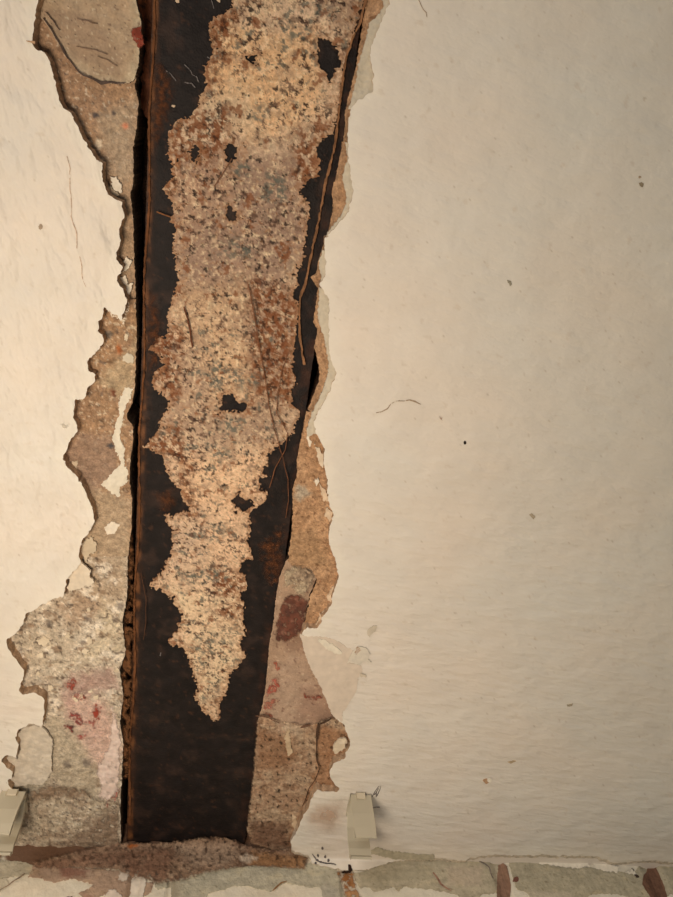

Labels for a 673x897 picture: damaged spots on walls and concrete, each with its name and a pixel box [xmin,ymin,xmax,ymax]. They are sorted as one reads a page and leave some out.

crack [26,11,126,85]
crack [67,157,86,287]
rust [298,0,367,365]
rust [121,0,168,825]
spalling [0,0,389,897]
peeling [353,847,673,897]